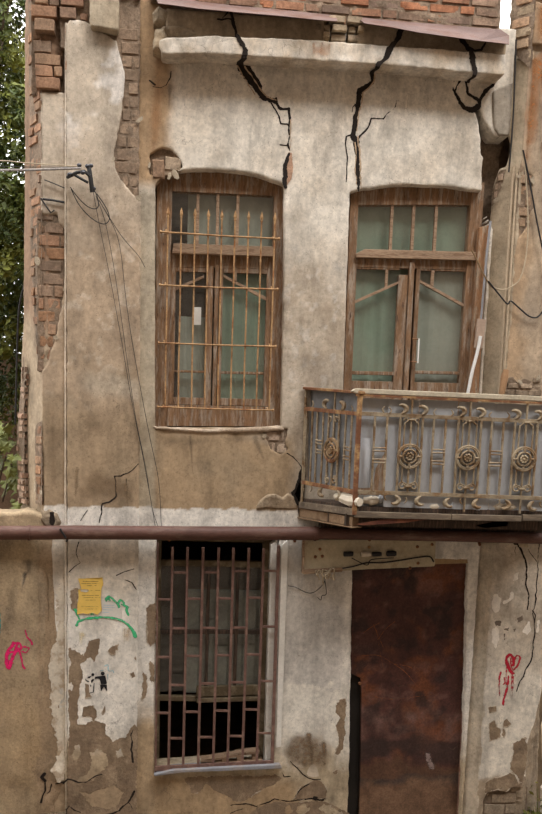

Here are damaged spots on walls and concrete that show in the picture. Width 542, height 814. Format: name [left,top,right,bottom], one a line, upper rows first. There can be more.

spalling [112,19,182,202]
crack [217,12,291,151]
crack [345,29,404,191]
crack [452,39,495,113]
spalling [16,0,65,526]
crack [80,464,138,523]
crack [513,543,540,692]
peeling [48,587,138,814]
crack [230,761,325,814]
peeling [335,698,347,755]
peeling [488,706,511,742]
spalling [483,737,528,814]